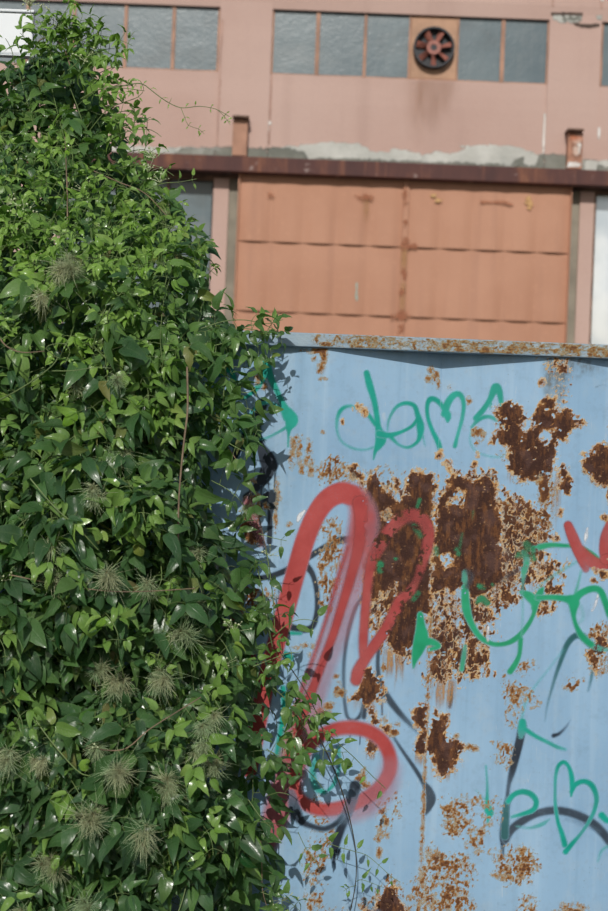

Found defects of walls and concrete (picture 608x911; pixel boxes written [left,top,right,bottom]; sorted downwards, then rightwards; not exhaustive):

flaking render [267,114,546,168]
rust [300,220,608,380]
rust [425,367,451,388]
rust [580,440,608,501]
rust [245,586,277,608]
rust [590,558,608,583]
rust [288,377,587,911]
rust [563,621,608,692]